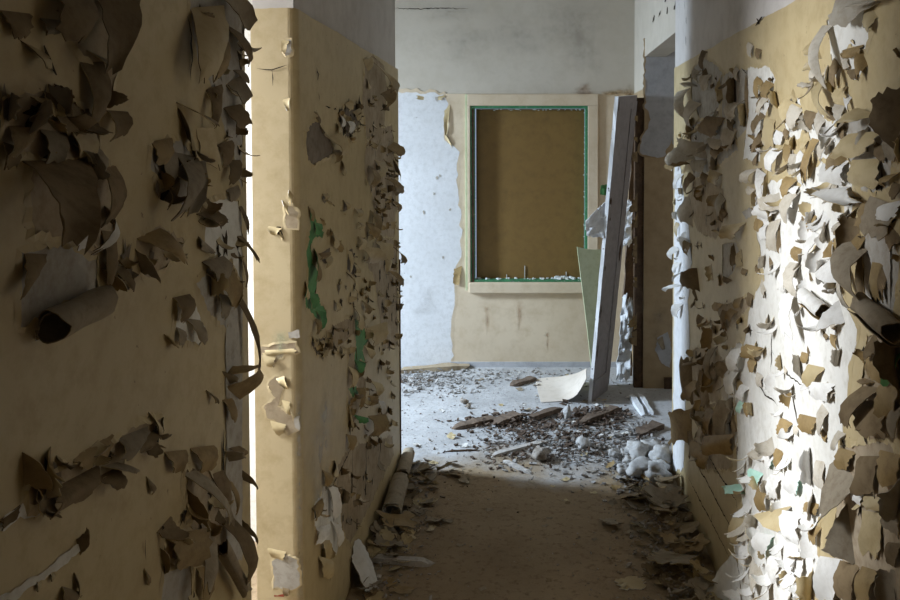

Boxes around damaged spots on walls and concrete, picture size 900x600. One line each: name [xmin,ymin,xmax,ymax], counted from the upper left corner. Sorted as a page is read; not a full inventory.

peeling [0,0,465,600]
peeling [627,313,637,346]
peeling [629,195,637,263]
peeling [631,0,900,600]